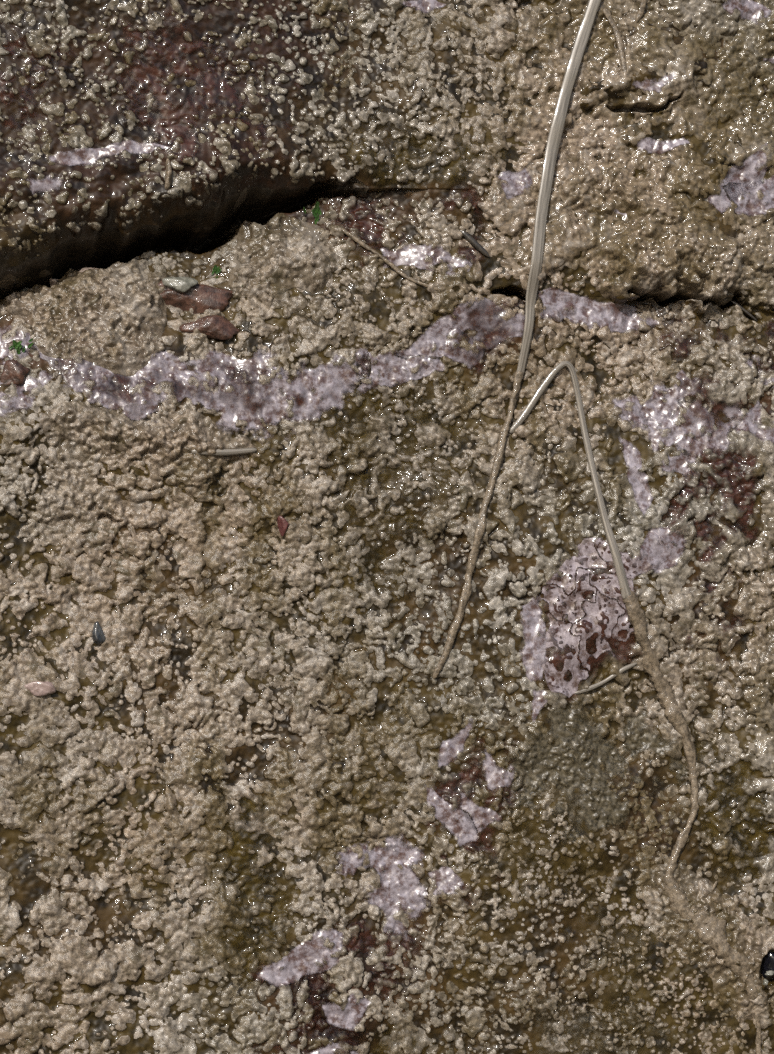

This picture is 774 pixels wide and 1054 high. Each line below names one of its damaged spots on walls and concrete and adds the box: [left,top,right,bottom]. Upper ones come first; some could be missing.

crack [0,177,369,299]